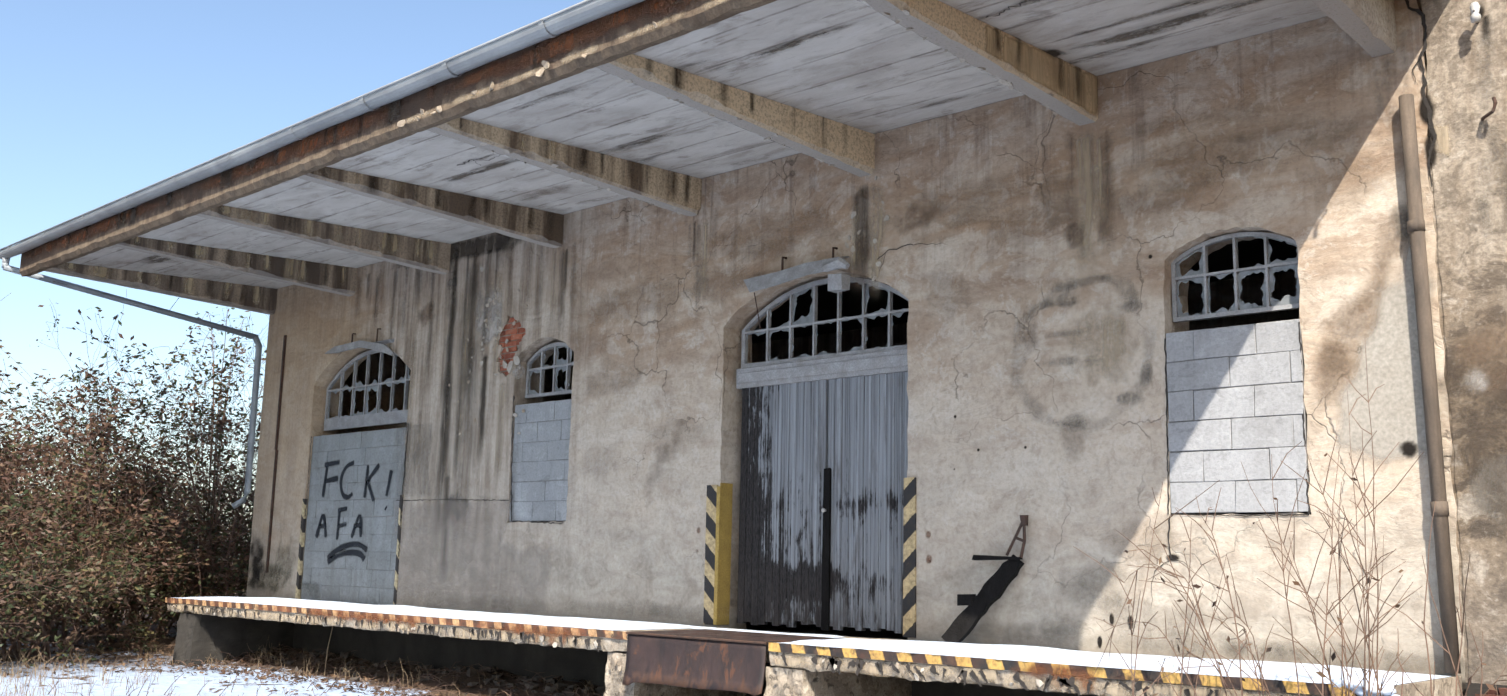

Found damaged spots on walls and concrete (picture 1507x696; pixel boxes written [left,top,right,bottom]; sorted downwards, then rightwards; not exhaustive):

corrosion [209,100,398,186]
corrosion [32,192,171,256]
damp [417,208,532,476]
flaking render [448,266,528,435]
damp [1321,344,1351,374]